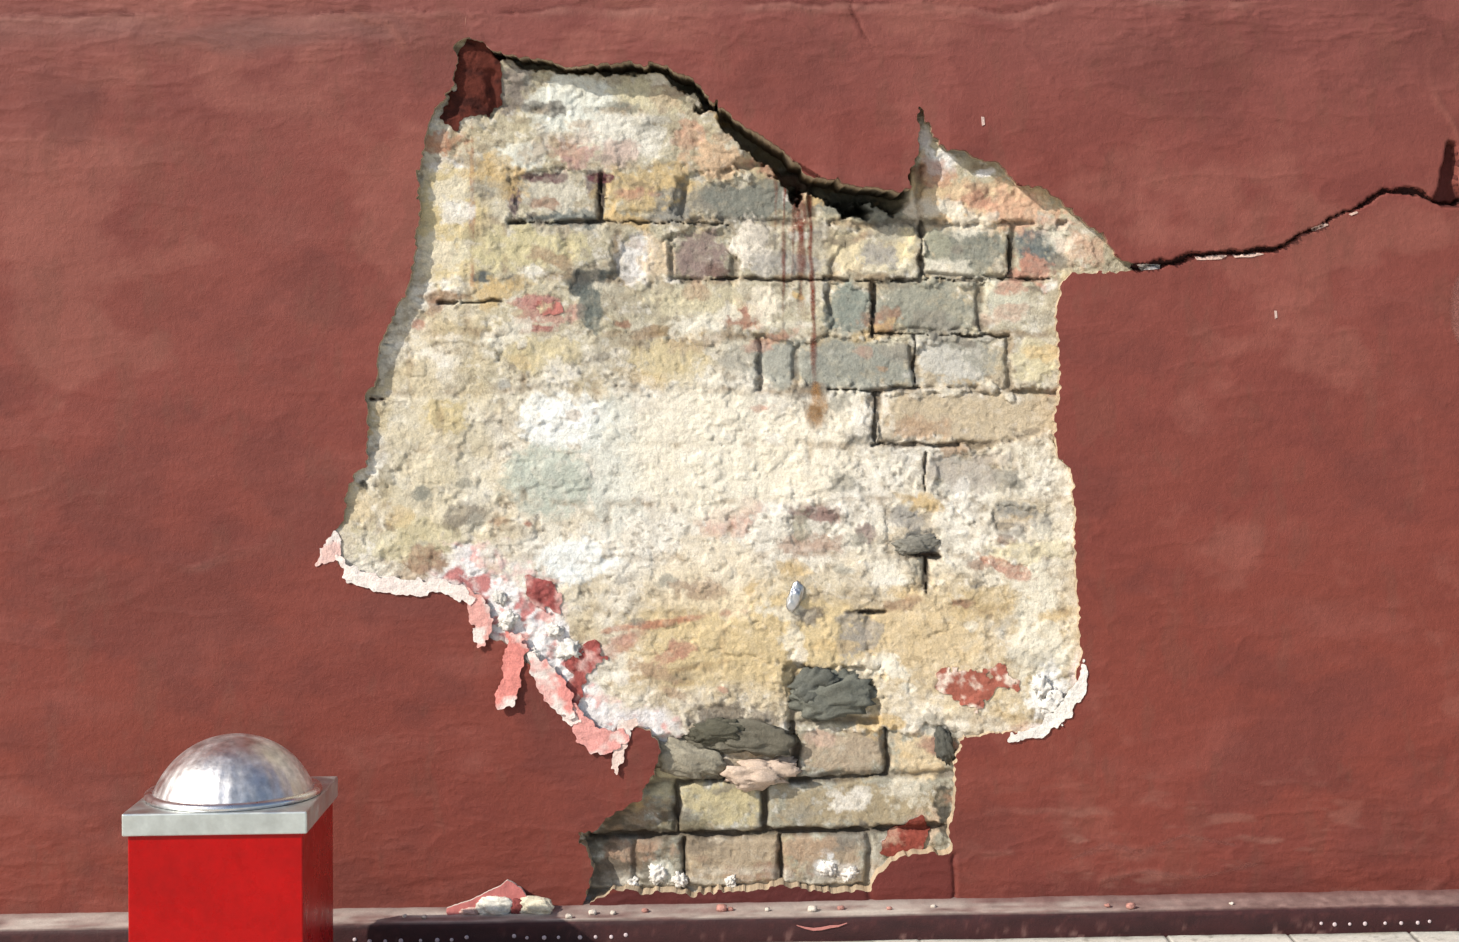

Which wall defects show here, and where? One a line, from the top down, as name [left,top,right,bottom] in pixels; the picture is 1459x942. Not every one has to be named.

spalling [315,38,1133,901]
crack [1129,187,1459,271]